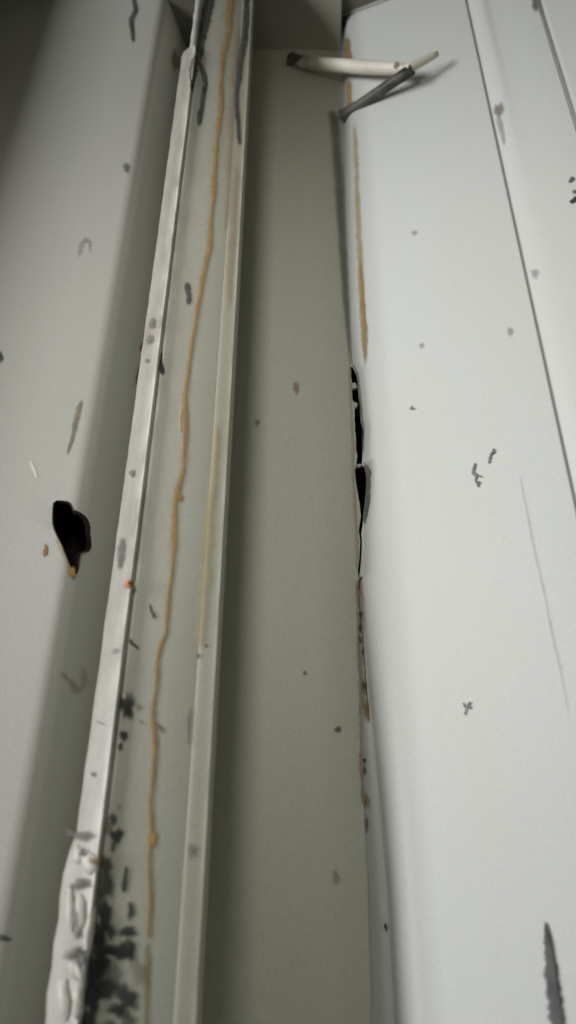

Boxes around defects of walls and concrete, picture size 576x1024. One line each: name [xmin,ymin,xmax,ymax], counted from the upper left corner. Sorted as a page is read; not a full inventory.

damp [190,0,213,125]
damp [234,0,249,144]
corrosion [354,133,367,359]
crack [331,113,371,576]
hole [55,504,86,568]
mould [120,696,134,717]
peeling [55,831,98,1022]
mould [81,814,136,1024]